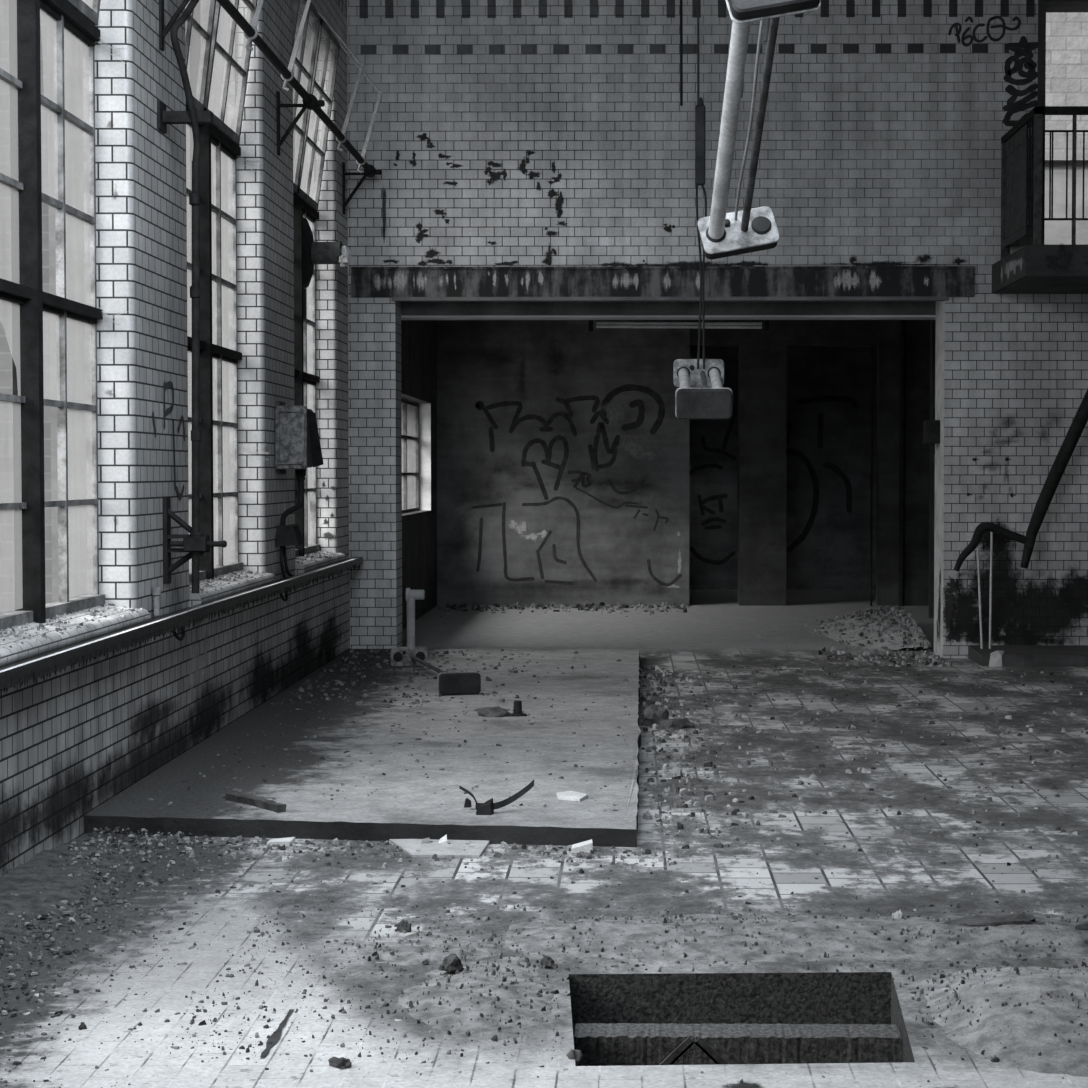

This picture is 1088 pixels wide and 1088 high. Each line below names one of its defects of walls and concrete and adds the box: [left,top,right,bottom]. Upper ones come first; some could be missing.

spalling [417,133,463,168]
spalling [484,150,567,265]
spalling [415,222,453,266]
water stain [375,270,456,291]